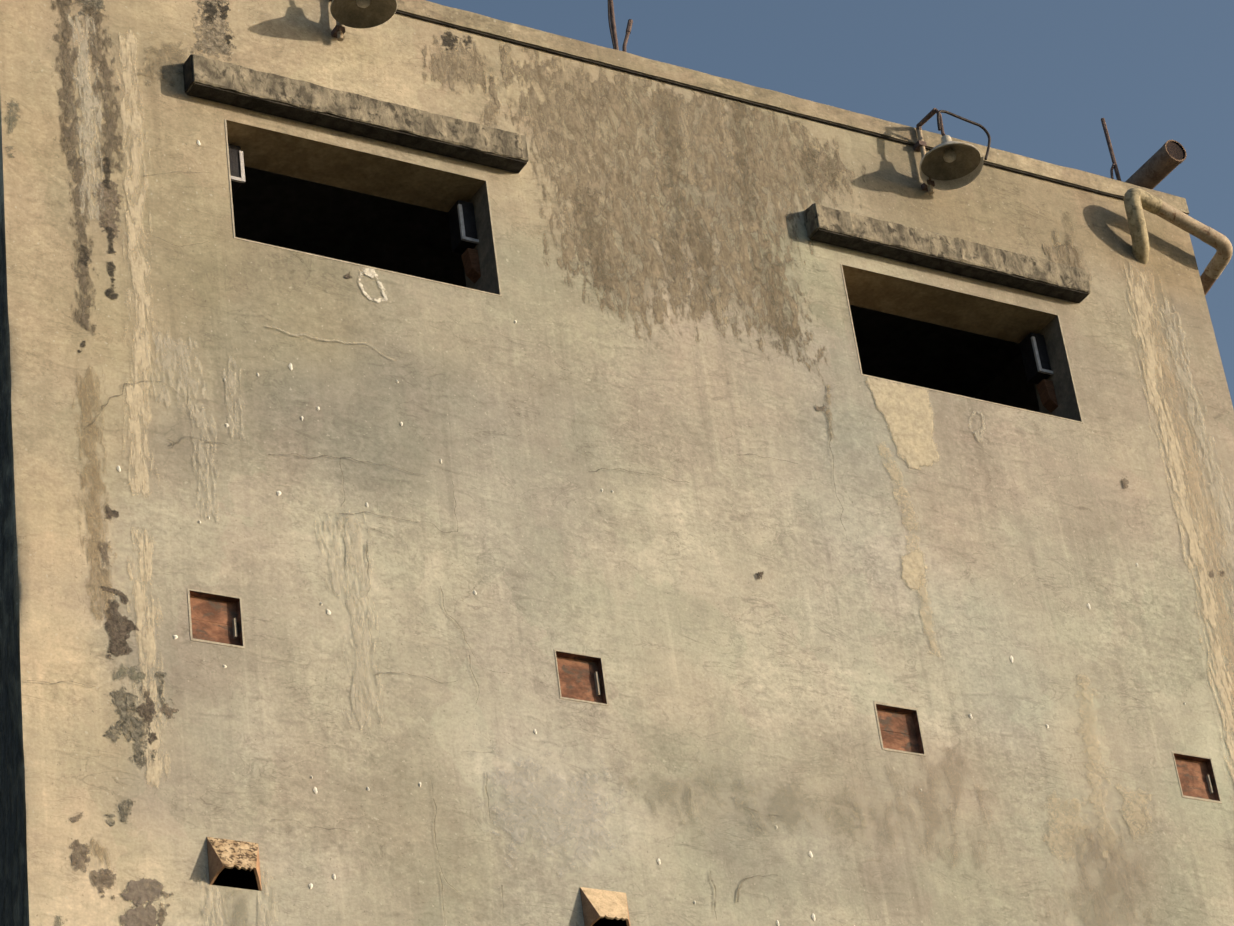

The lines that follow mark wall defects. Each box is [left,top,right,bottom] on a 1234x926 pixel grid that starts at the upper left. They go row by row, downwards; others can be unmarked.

damp [51,0,194,495]
damp [422,29,865,371]
damp [0,203,27,926]
damp [73,367,114,619]
damp [128,529,170,787]